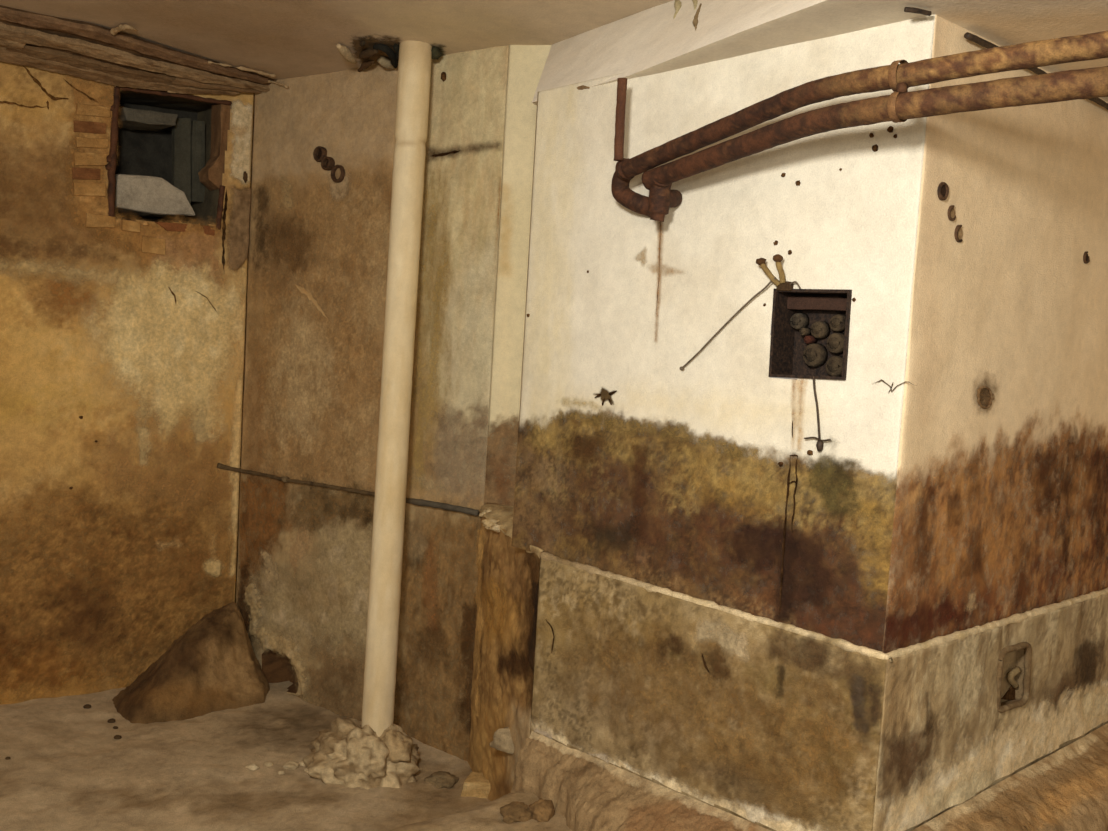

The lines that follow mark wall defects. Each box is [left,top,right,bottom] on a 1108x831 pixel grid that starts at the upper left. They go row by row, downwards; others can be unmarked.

crack [0,66,99,110]
peeling [0,5,289,576]
rust [656,221,672,336]
water stain [0,175,392,705]
flaking render [246,504,373,696]
water stain [302,644,365,721]
peeling [475,529,508,717]
water stain [394,183,1108,831]